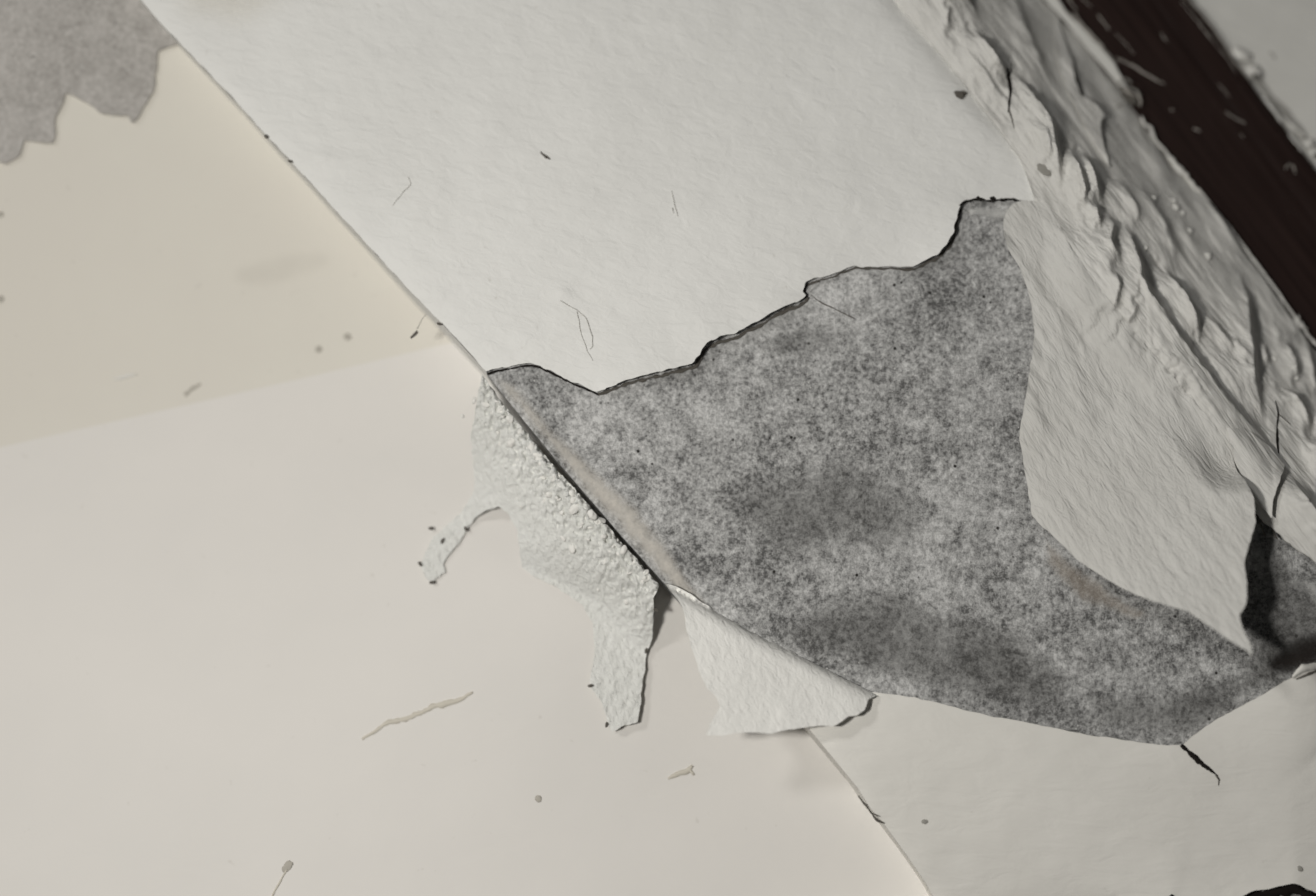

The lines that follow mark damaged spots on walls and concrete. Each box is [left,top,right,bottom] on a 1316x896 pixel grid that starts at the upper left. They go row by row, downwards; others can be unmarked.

flaking render [0,0,179,164]
spalling [418,196,1316,745]
crack [1180,744,1220,786]
crack [1244,884,1316,896]